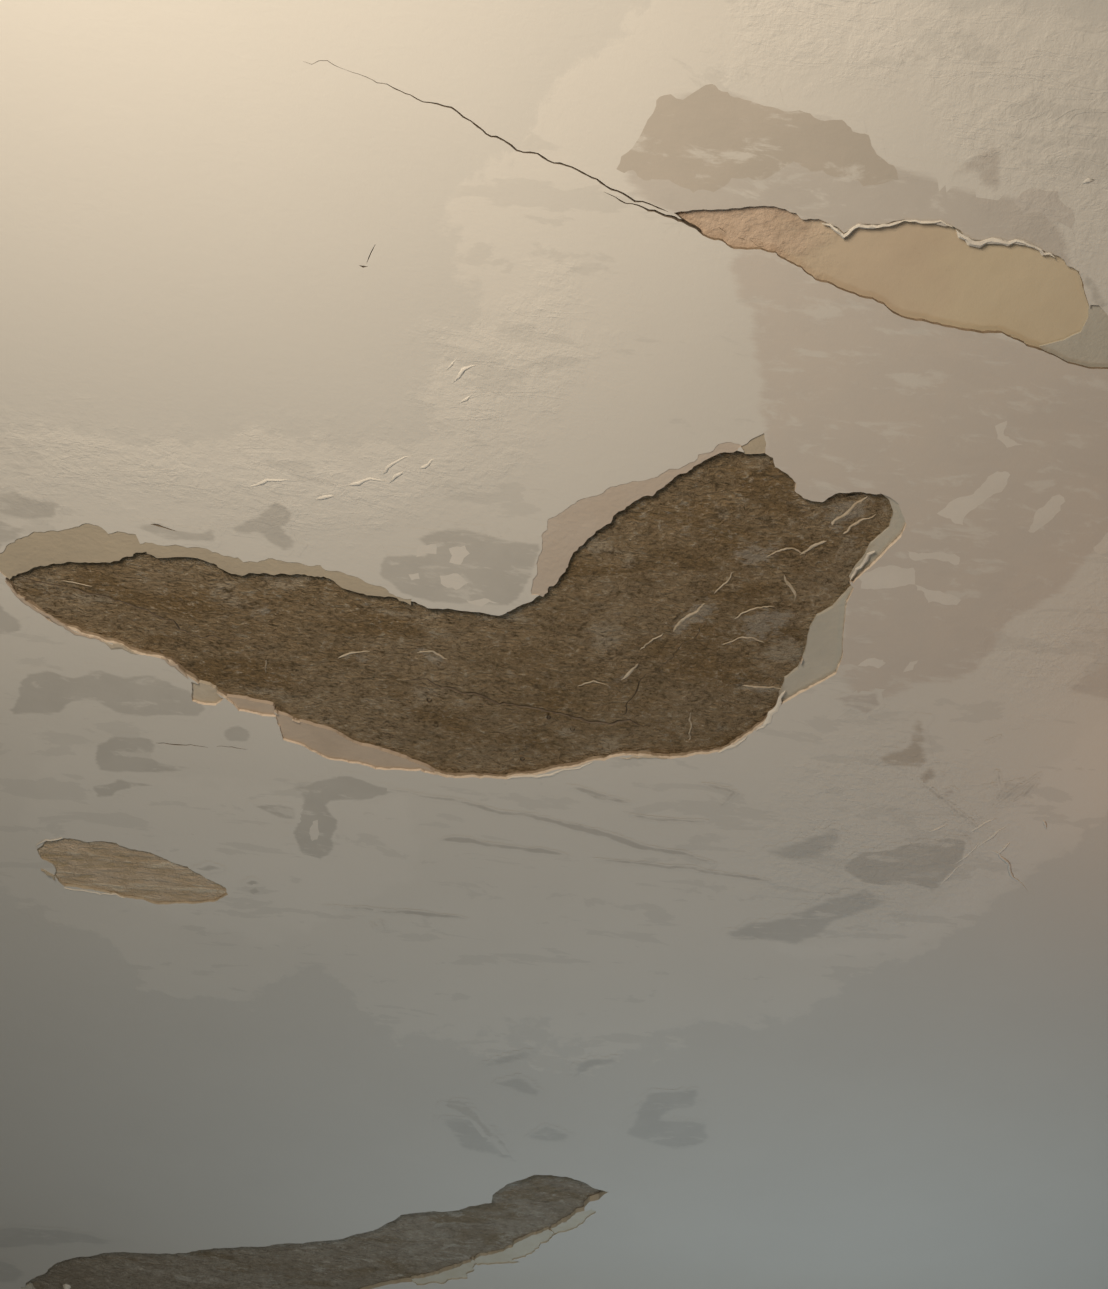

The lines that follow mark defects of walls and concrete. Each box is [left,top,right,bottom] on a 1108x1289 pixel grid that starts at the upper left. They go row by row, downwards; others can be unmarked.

crack [303,60,701,231]
flaking render [0,75,1108,865]
flaking render [36,838,228,904]
flaking render [21,1175,608,1289]